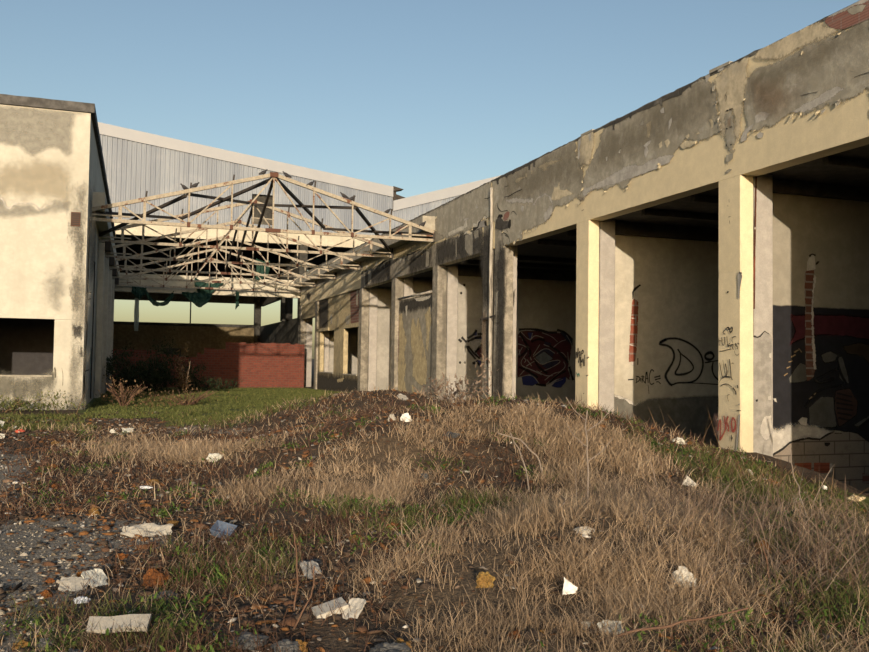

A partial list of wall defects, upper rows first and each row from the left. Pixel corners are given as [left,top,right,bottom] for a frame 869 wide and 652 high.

water stain [0,197,67,215]
water stain [0,107,73,153]
water stain [71,191,96,336]
peeling [363,0,869,270]
flaking render [753,331,869,492]